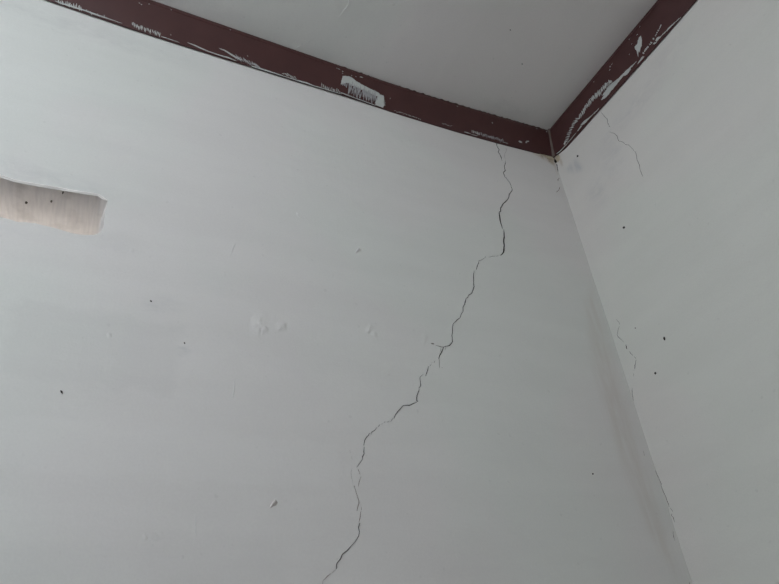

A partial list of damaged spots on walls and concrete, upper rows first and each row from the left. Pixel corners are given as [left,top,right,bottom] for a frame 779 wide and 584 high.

crack [328,143,513,576]